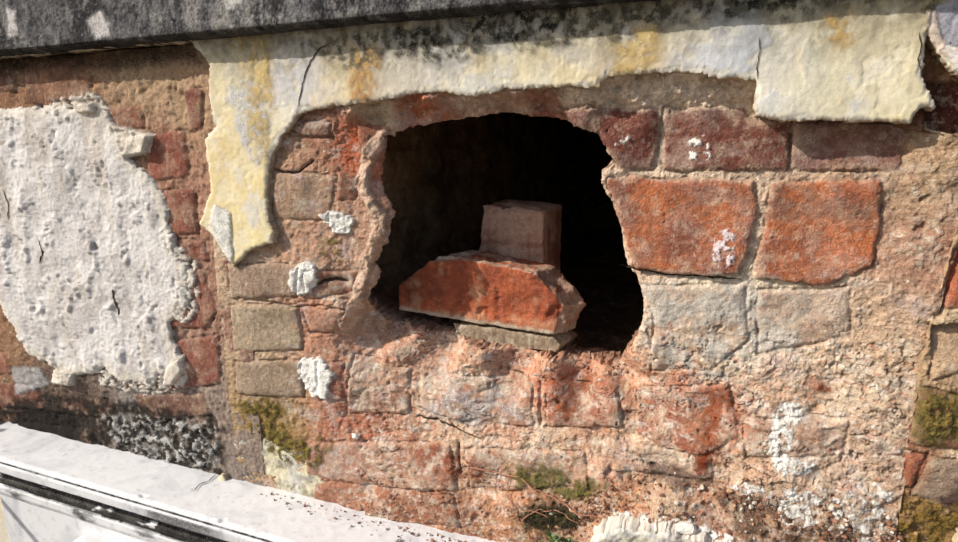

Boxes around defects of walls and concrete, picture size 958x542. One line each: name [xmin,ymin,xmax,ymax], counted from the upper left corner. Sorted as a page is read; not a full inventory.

mould [302,0,848,69]
peeling [927,0,958,71]
spalling [0,44,282,490]
spalling [213,43,958,542]
damp [0,366,225,476]